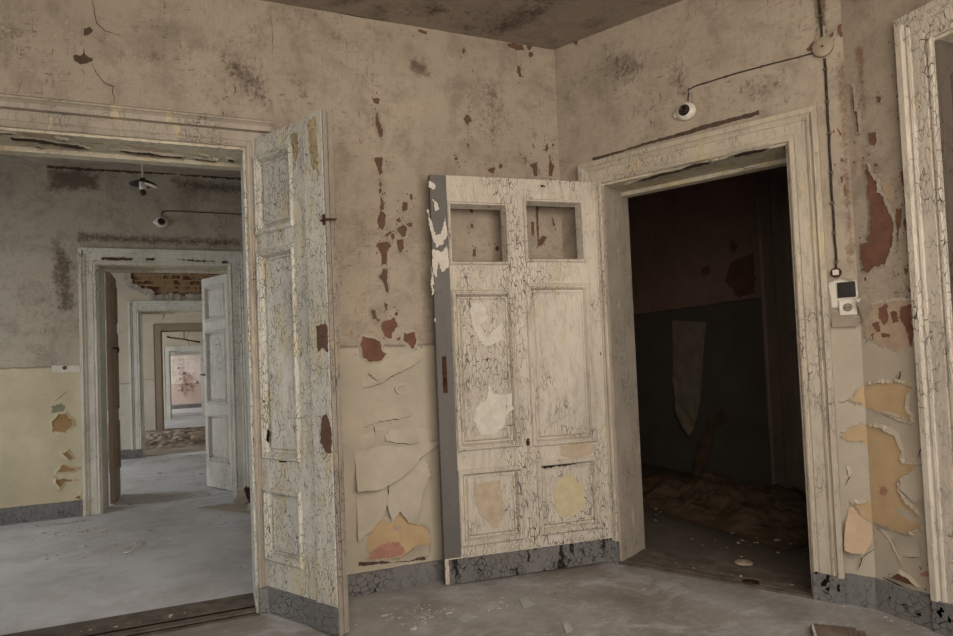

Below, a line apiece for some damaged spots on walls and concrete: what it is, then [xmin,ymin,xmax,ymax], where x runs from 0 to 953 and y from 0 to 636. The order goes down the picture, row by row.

peeling [371,92,385,141]
damp [49,169,99,191]
peeling [828,83,915,354]
peeling [355,157,422,365]
peeling [49,403,76,435]
peeling [53,449,83,500]
peeling [839,378,926,537]
peeling [359,512,432,566]